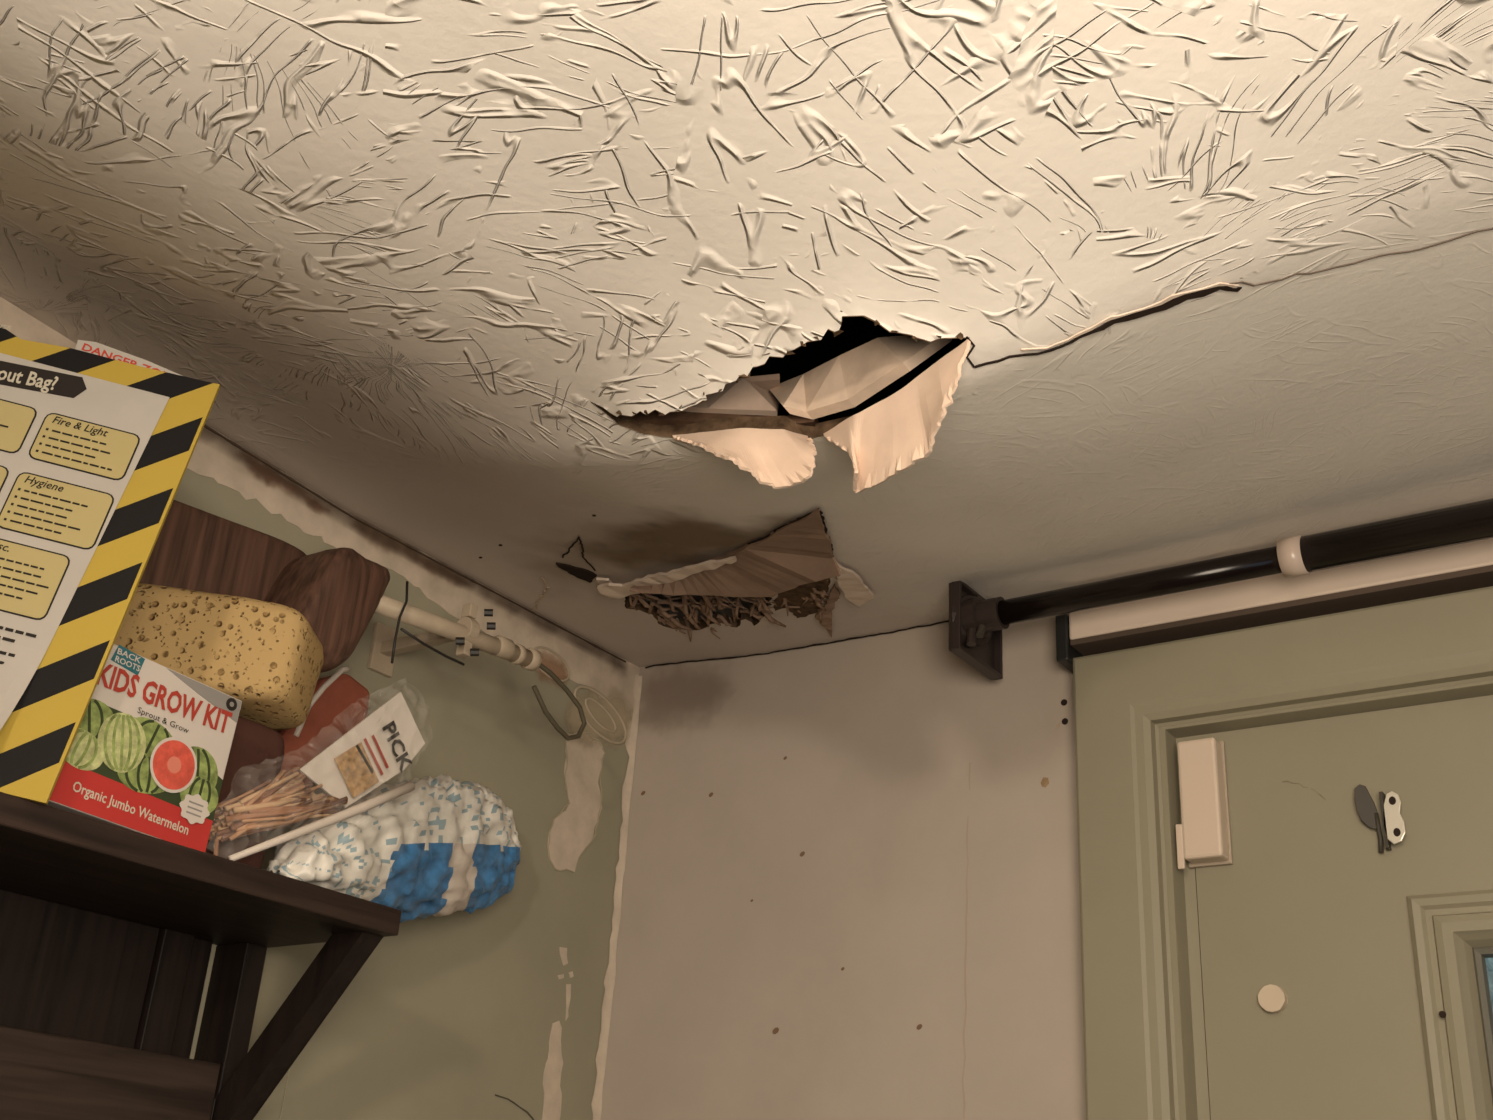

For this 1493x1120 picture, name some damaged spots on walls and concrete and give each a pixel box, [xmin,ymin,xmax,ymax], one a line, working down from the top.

crack [966,227,1493,368]
spalling [591,315,970,439]
spalling [624,597,772,630]
peeling [547,732,605,873]